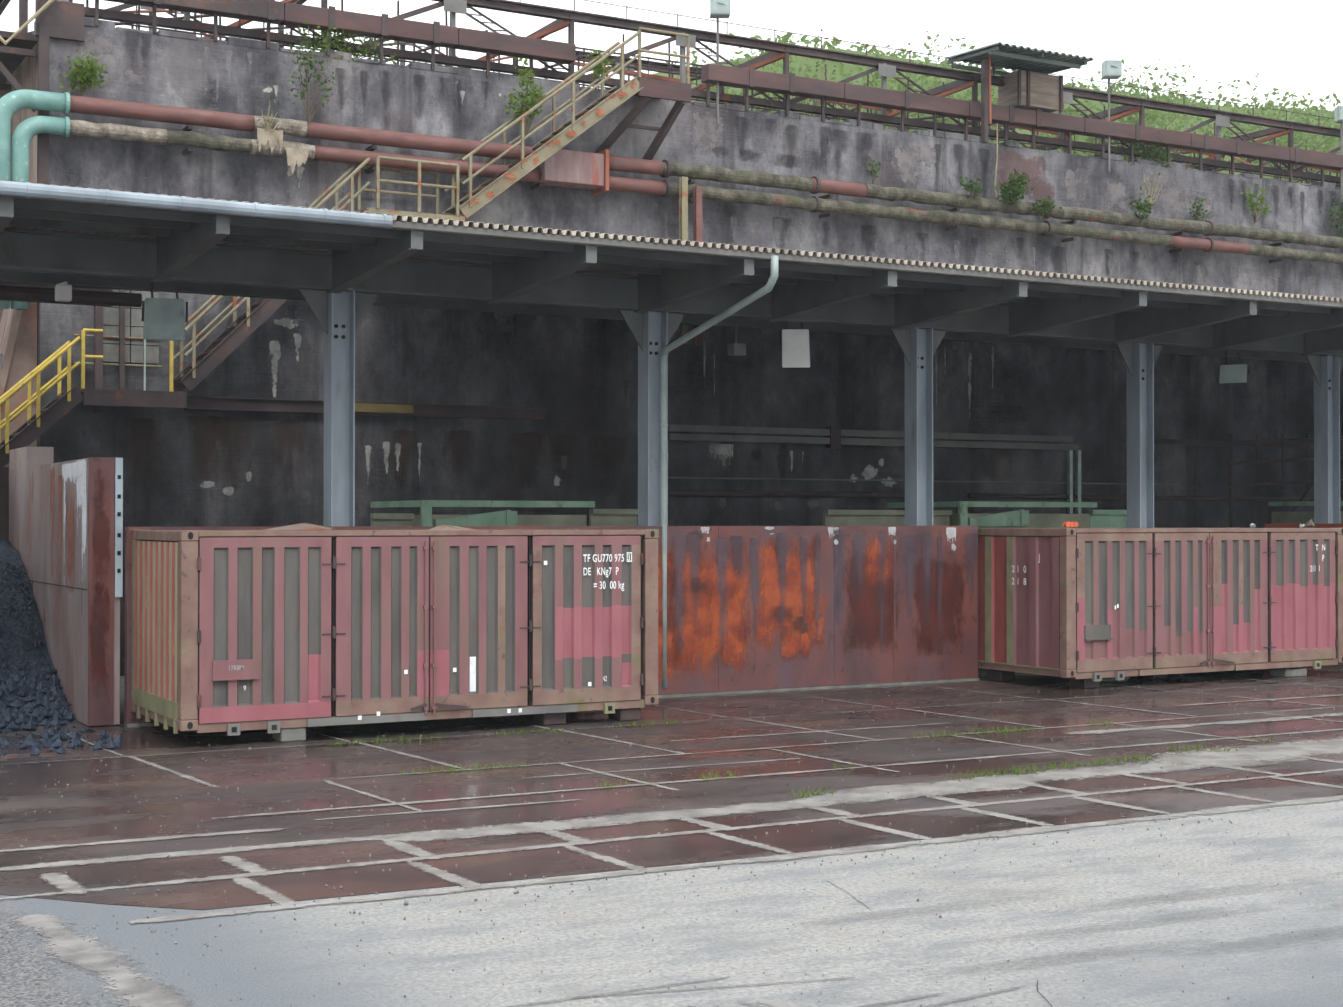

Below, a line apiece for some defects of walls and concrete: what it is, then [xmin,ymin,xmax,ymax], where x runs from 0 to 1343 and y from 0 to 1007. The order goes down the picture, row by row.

damp [269,318,302,397]
rust [50,468,74,578]
rust [90,473,110,685]
rust [658,540,824,680]